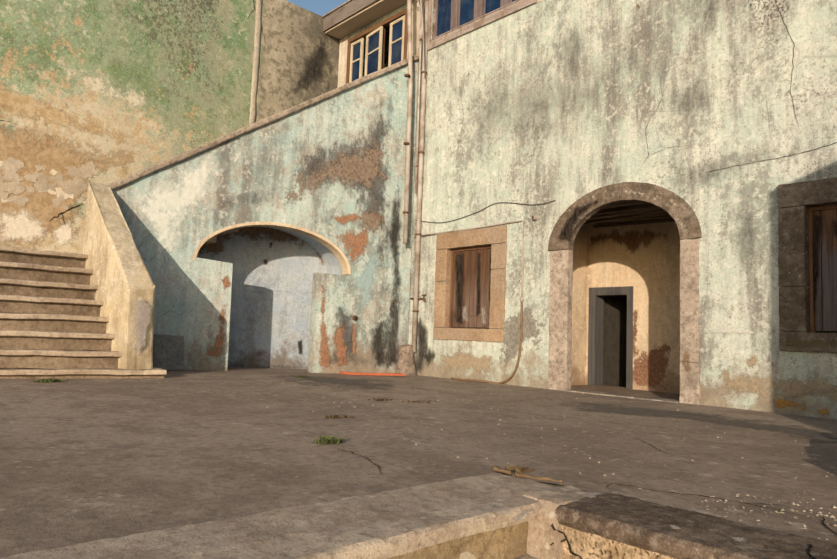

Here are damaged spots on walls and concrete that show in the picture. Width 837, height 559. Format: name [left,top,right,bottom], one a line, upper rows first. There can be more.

crack [761,0,799,127]
peeling [0,126,133,249]
peeling [332,208,385,260]
water stain [372,190,400,365]
crack [636,70,681,174]
crack [705,142,837,173]
peeling [633,310,670,389]
crack [550,524,582,559]